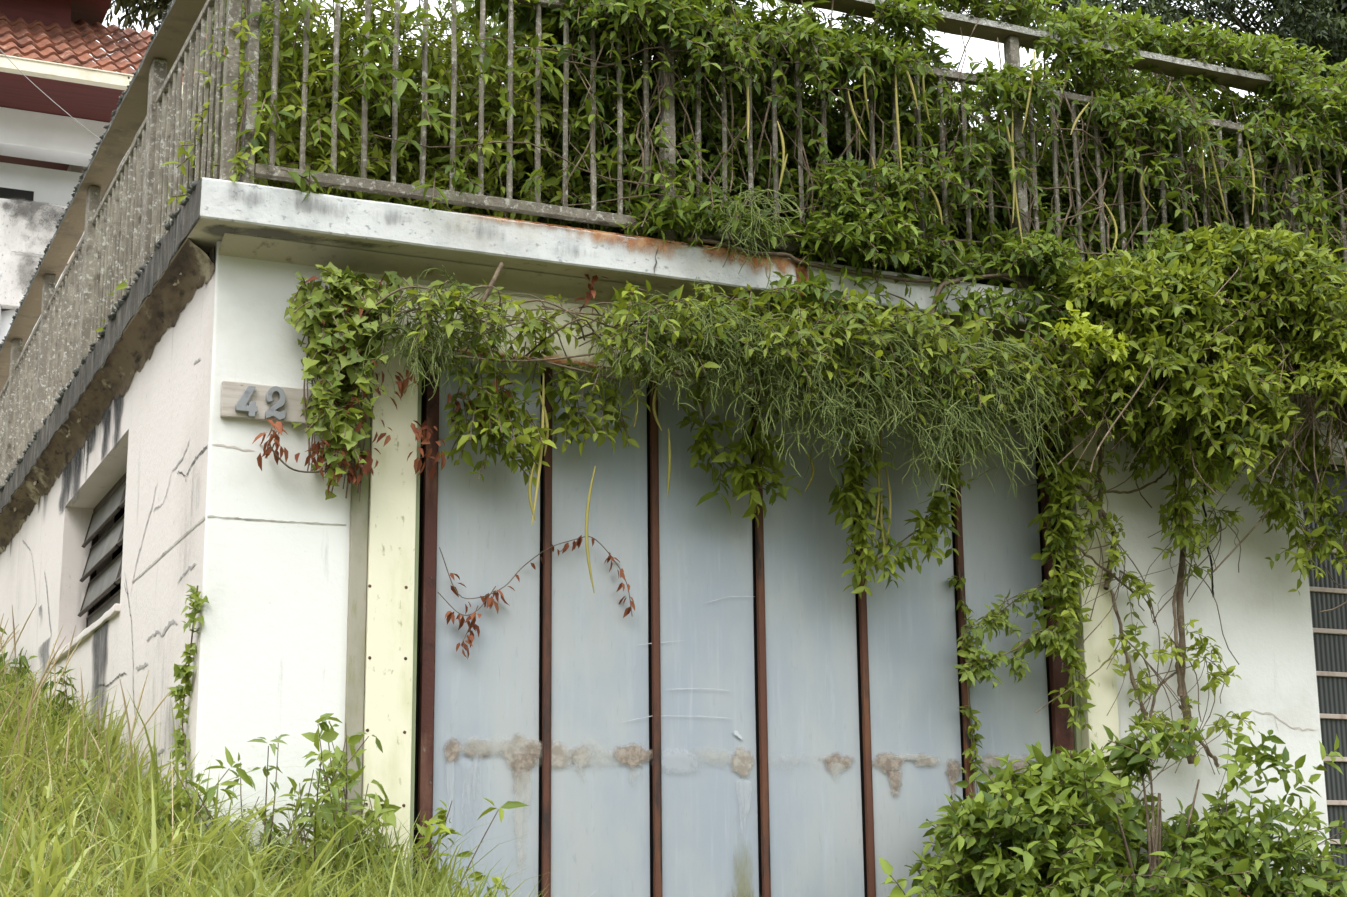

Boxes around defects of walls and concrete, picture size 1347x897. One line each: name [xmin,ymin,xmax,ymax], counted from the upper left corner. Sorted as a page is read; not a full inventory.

rust [492,216,810,295]
leakage [38,394,123,512]
crack [98,439,254,755]